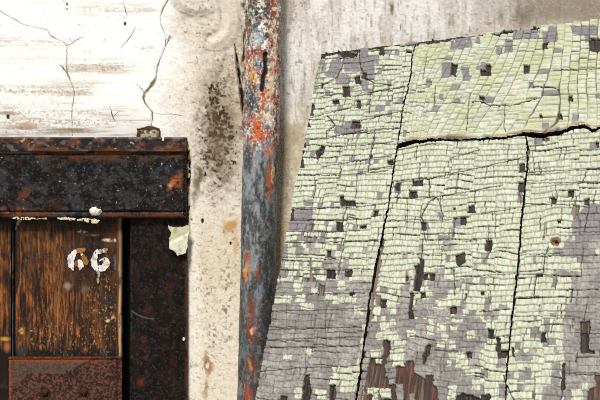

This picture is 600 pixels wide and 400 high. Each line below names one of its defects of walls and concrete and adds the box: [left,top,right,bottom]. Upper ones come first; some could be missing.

crack [0,11,82,80]
crack [139,0,169,127]